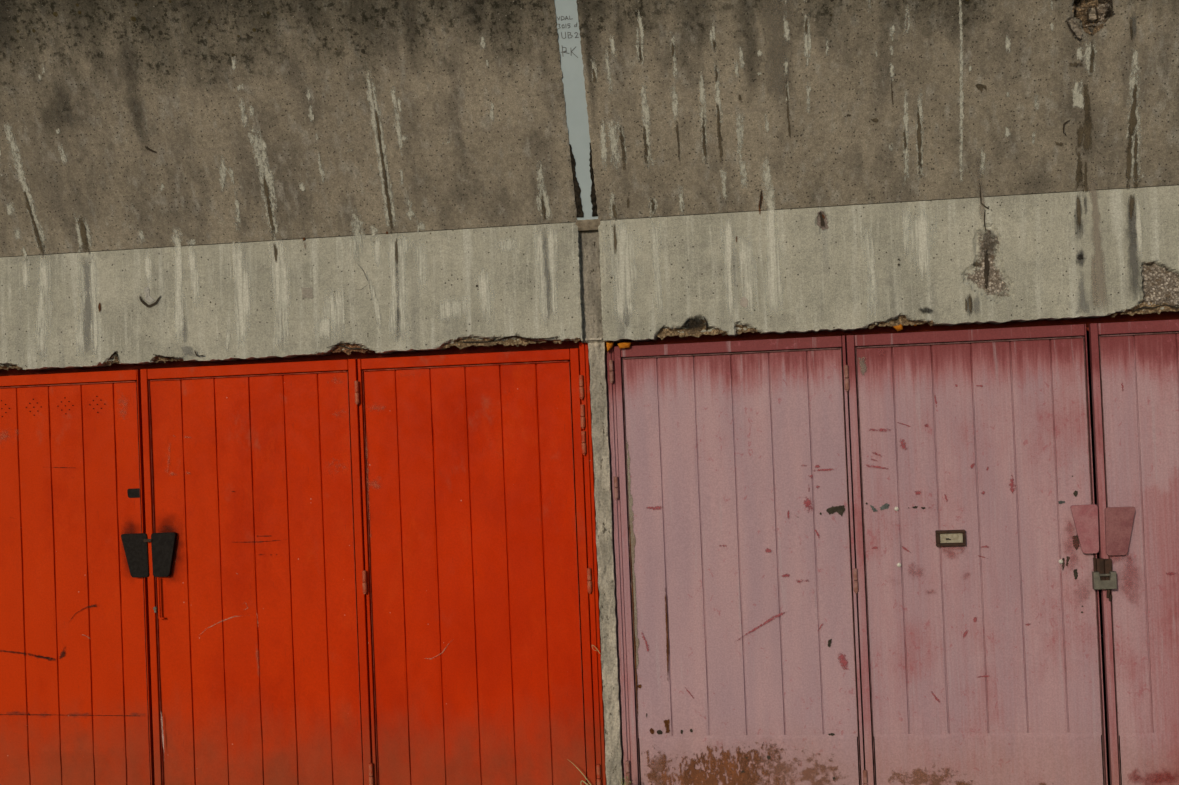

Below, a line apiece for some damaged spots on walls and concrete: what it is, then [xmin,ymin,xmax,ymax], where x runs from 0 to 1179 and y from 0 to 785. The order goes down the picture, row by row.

leakage [0,124,52,354]
leakage [237,83,289,342]
leakage [351,72,426,337]
spalling [440,336,581,349]
spalling [657,316,757,340]
leakage [721,160,782,314]
spalling [965,230,1009,296]
leakage [1063,43,1105,311]
leakage [1126,16,1144,291]
spalling [1111,262,1179,317]
rust [641,742,839,785]
rust [889,769,968,785]